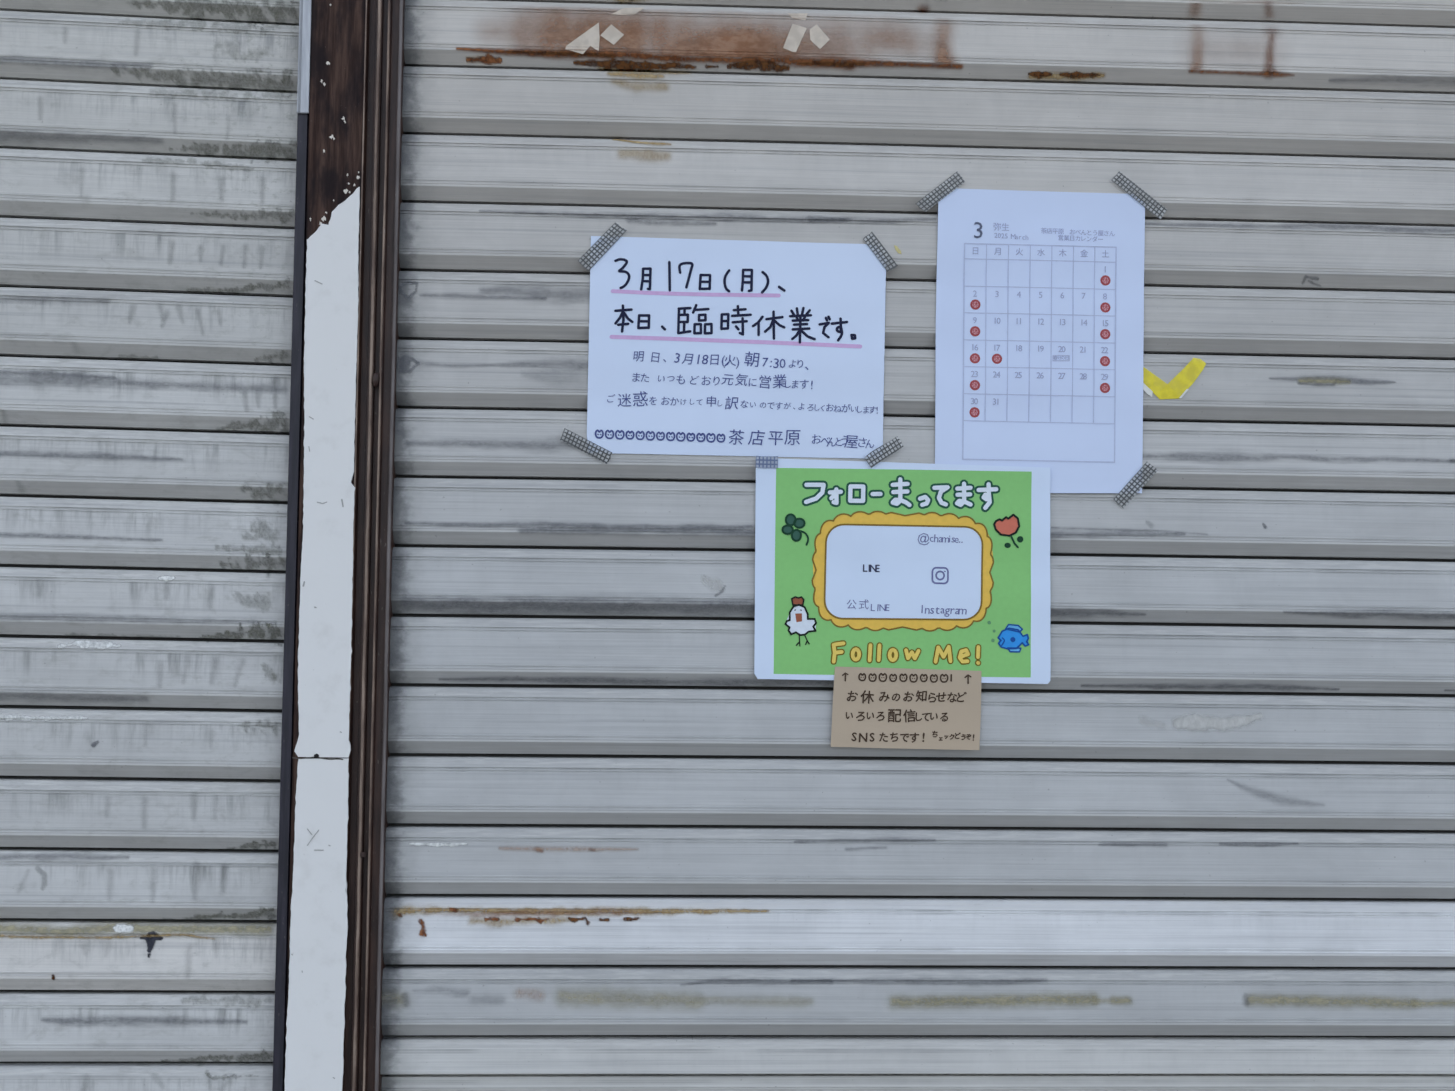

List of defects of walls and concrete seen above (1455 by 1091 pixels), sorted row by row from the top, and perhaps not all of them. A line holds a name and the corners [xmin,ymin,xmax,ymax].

corrosion [456,0,963,78]
corrosion [1028,71,1104,80]
corrosion [1189,61,1291,77]
corrosion [394,908,768,937]